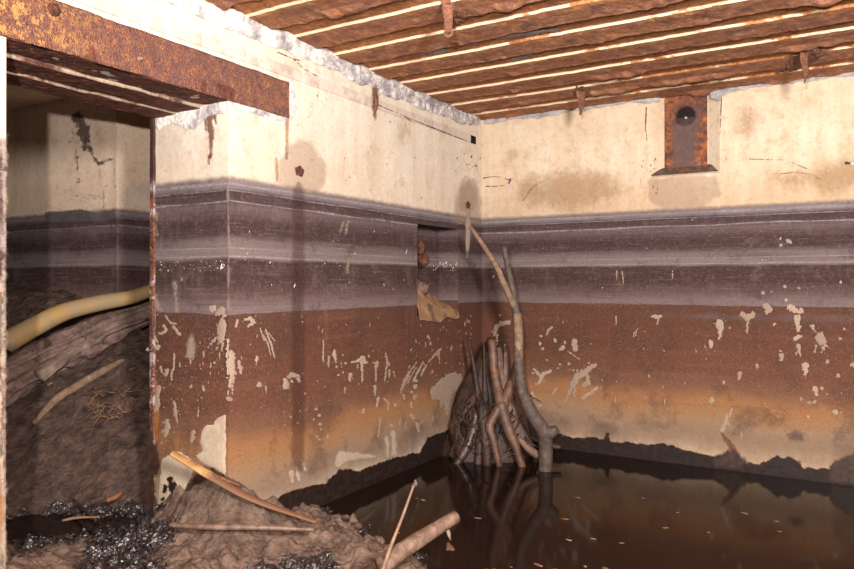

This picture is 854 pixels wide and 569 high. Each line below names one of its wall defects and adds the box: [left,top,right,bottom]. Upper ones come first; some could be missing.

corrosion [440,2,468,24]
peeling [155,0,660,144]
corrosion [779,47,827,71]
corrosion [204,114,217,164]
leakage [145,430,225,513]
peeling [159,415,226,502]
leakage [278,430,449,510]
leakage [553,433,854,486]